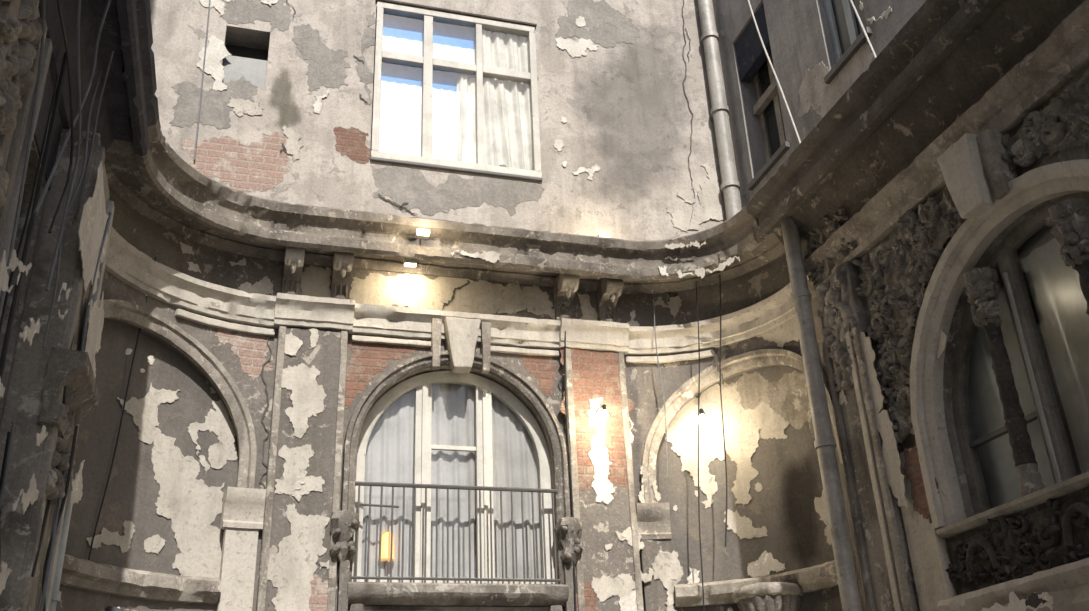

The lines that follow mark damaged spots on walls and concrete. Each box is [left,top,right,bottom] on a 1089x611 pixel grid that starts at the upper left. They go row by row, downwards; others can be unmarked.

flaking render [169,35,304,192]
flaking render [199,0,376,114]
flaking render [333,126,544,216]
flaking render [555,0,641,58]
crack [682,0,695,222]
peeling [665,163,724,249]
peeling [659,256,740,279]
peeling [86,381,238,578]
peeling [215,325,337,611]
flaking render [520,347,661,504]
peeling [665,370,815,539]
peeling [576,550,700,611]